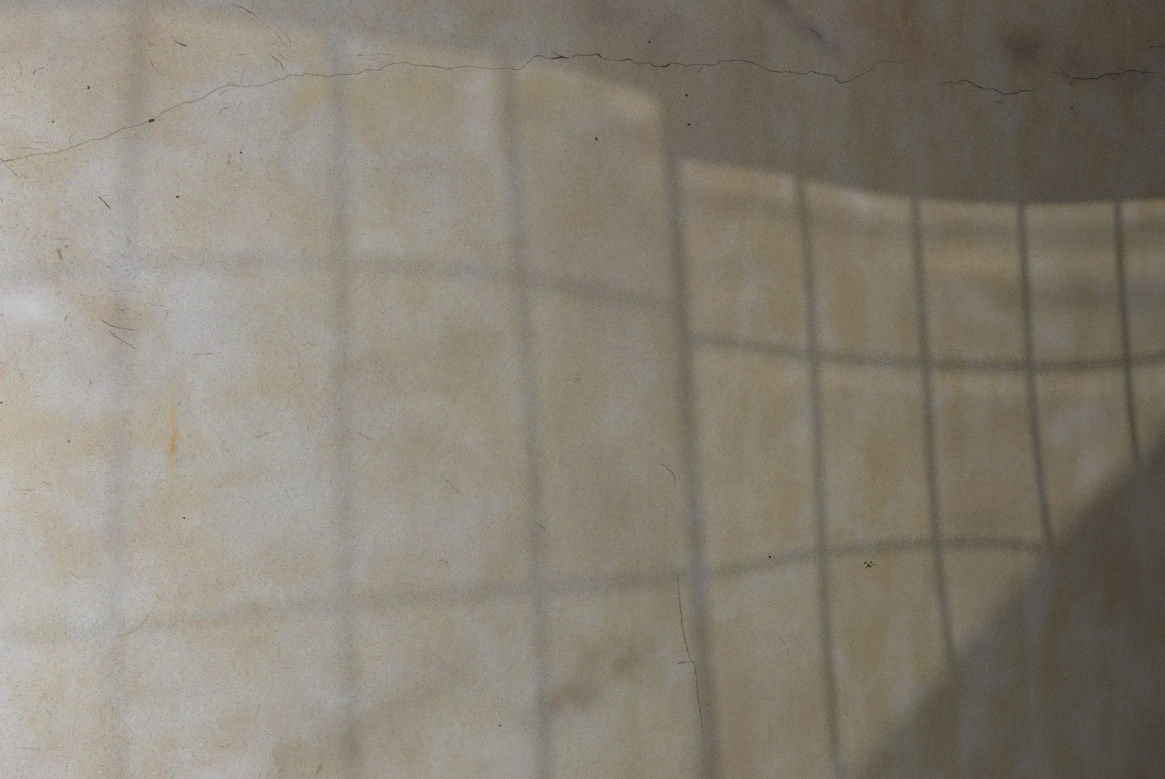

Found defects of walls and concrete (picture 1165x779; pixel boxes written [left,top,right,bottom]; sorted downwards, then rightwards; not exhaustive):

crack [0,51,894,161]